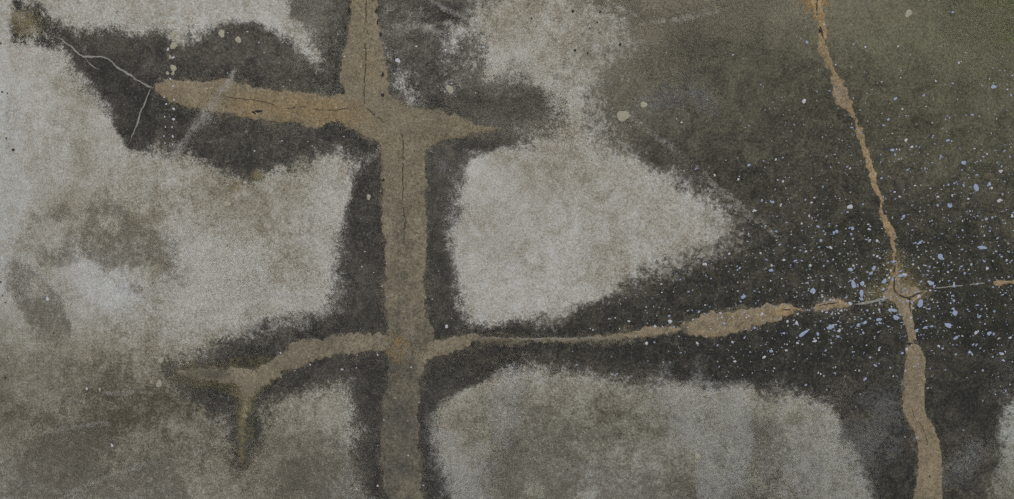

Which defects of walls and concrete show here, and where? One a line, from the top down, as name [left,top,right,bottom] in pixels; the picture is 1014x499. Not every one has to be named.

crack [59,38,153,141]
water stain [0,0,390,499]
crack [154,0,946,499]
water stain [376,0,1014,499]
crack [936,280,1014,288]